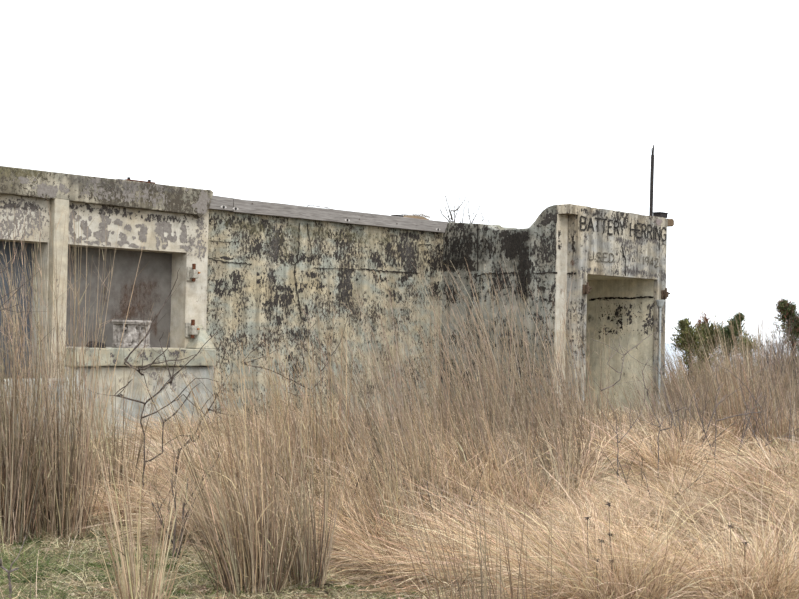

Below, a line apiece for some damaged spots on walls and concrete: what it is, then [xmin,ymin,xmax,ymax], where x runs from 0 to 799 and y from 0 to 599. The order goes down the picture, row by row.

peeling [0,167,354,374]
crack [290,223,432,322]
peeling [581,208,666,283]
peeling [596,299,666,340]